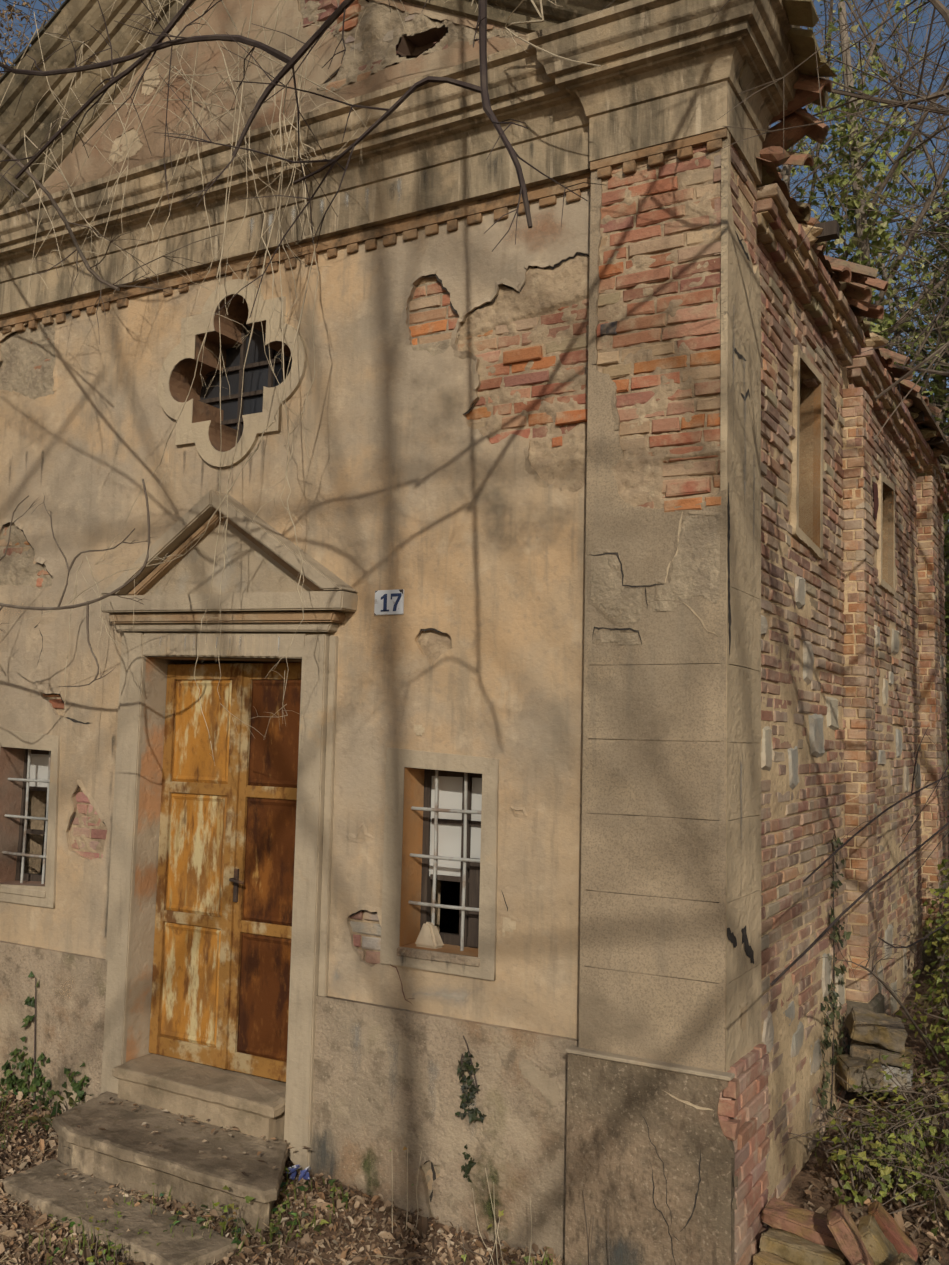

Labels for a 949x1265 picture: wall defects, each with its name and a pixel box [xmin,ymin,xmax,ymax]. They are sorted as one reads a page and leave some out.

flaking render [299,0,520,92]
flaking render [0,320,59,400]
flaking render [402,145,759,646]
flaking render [0,518,53,589]
crack [589,482,731,655]
flaking render [417,628,452,665]
flaking render [63,779,107,860]
flaking render [349,904,382,965]
crack [663,1090,712,1110]
crack [640,1111,701,1265]